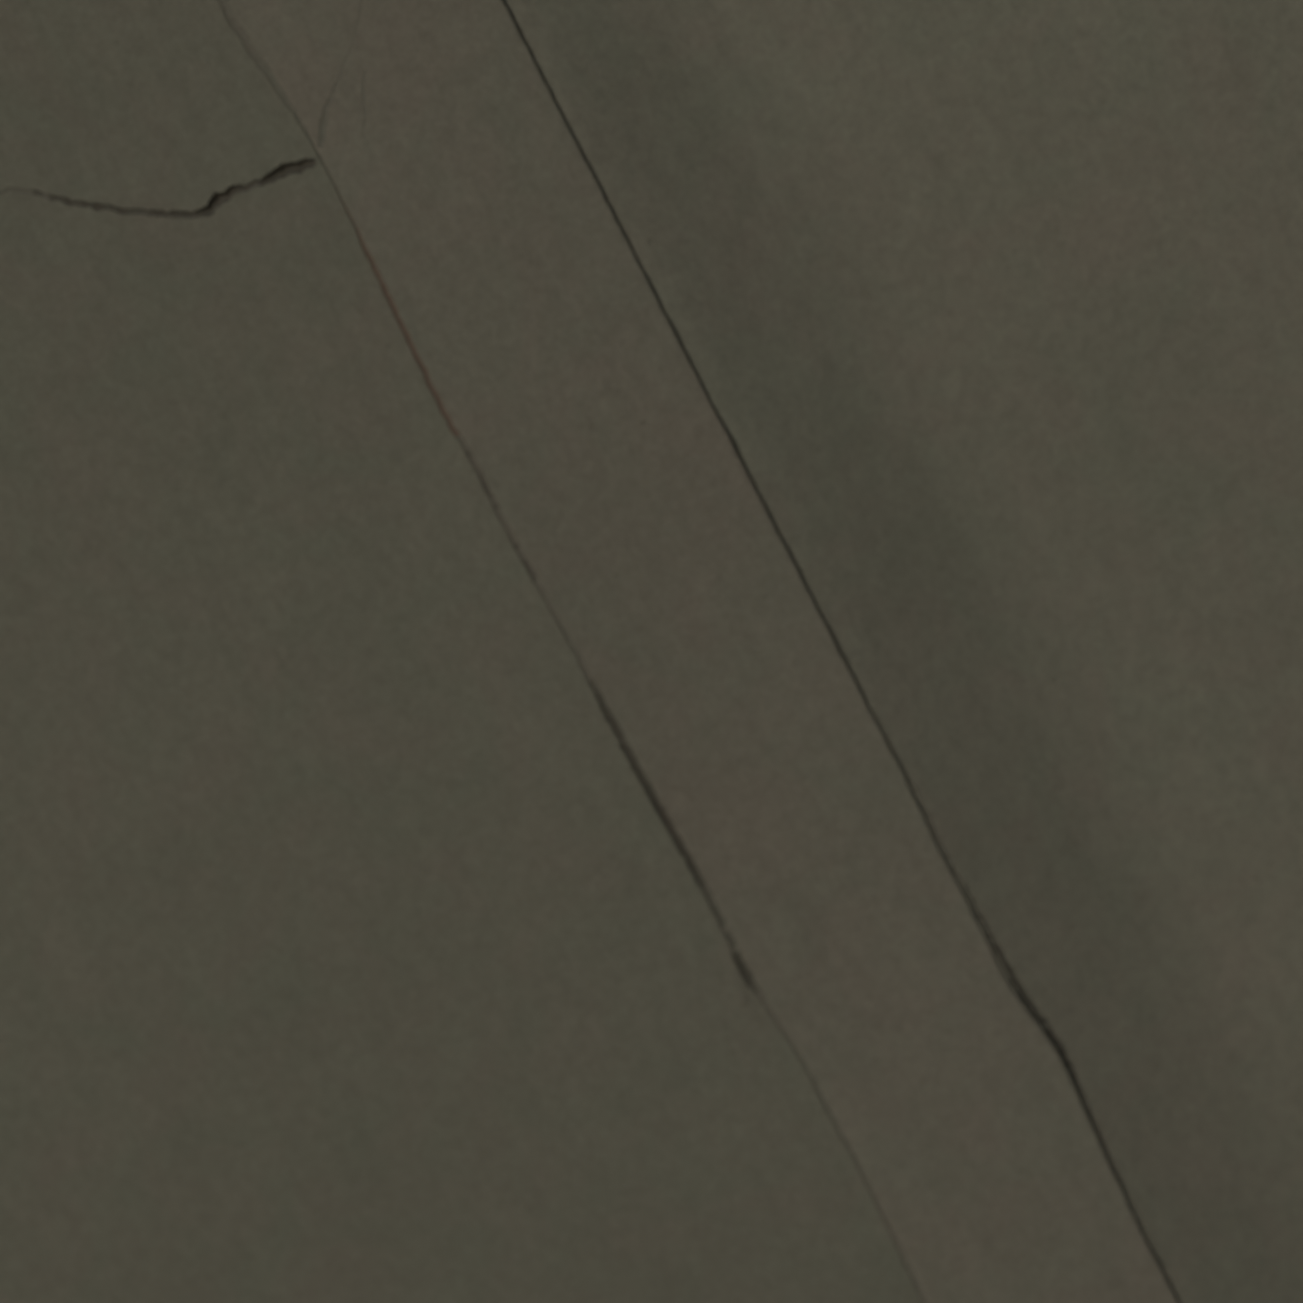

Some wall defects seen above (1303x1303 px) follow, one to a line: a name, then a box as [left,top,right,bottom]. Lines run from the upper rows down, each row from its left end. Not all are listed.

crack [0,0,927,1303]